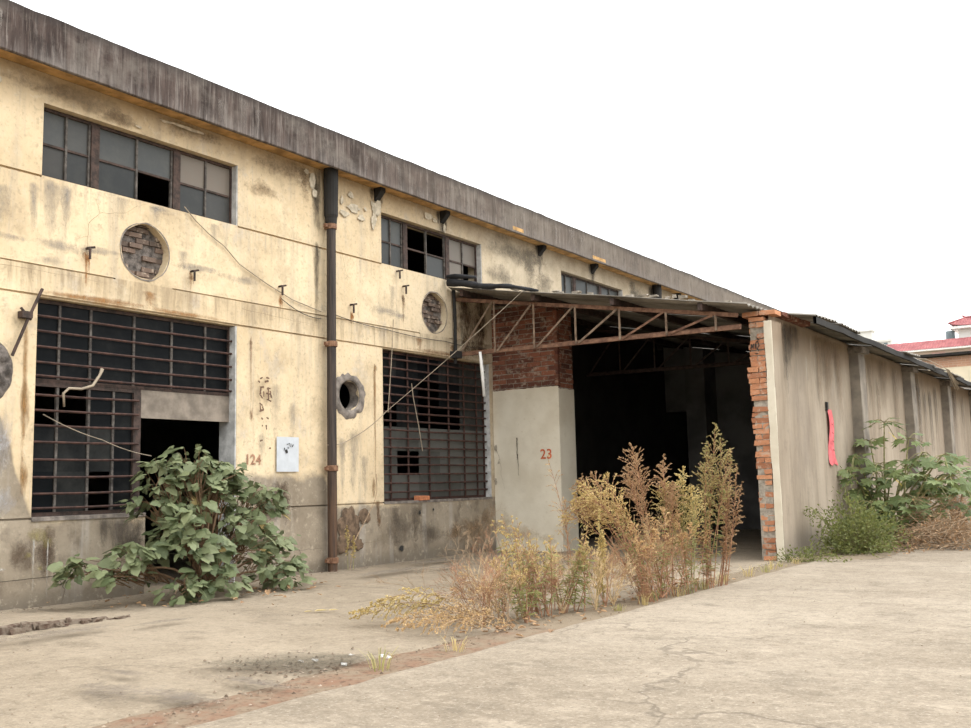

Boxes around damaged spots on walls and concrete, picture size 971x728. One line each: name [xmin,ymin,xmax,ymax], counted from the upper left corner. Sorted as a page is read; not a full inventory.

flaking render [304,169,317,198]
flaking render [340,191,381,231]